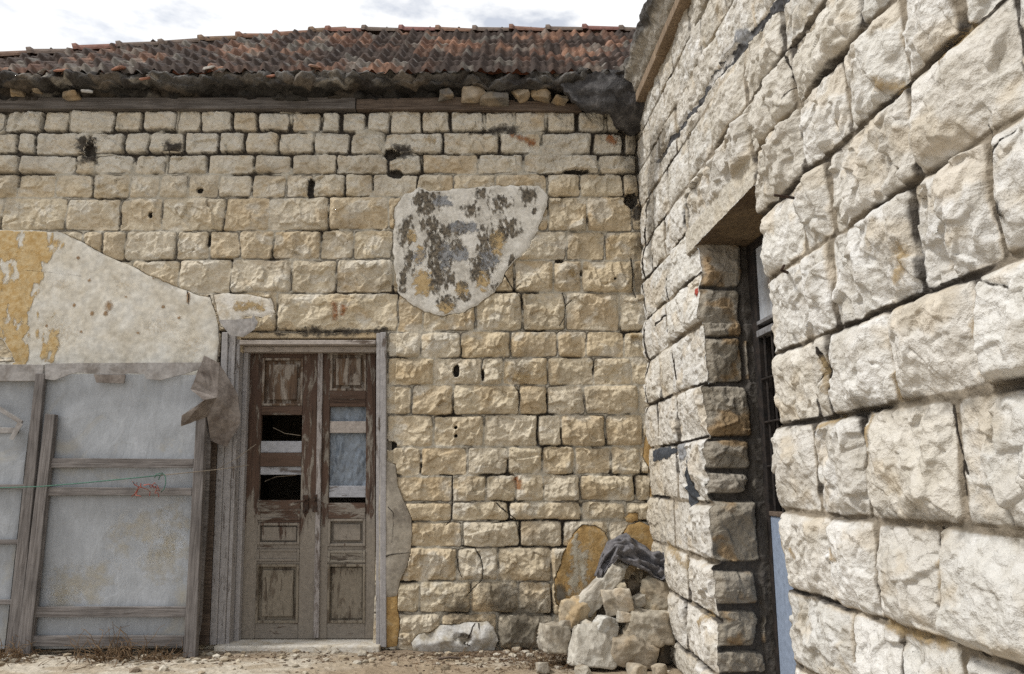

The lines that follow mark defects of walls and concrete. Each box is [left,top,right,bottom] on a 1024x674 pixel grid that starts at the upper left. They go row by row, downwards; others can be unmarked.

peeling [0,230,64,364]
water stain [397,187,537,309]
crack [457,545,483,598]